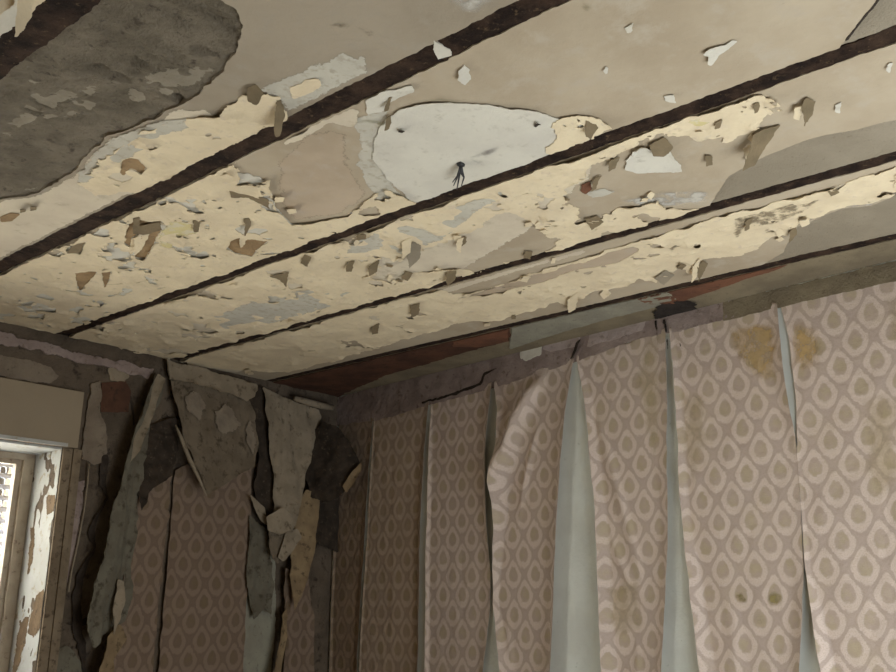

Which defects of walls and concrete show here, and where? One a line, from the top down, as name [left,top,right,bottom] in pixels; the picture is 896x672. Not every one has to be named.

peeling [0,0,896,426]
peeling [8,450,62,672]
flaking render [243,539,276,672]